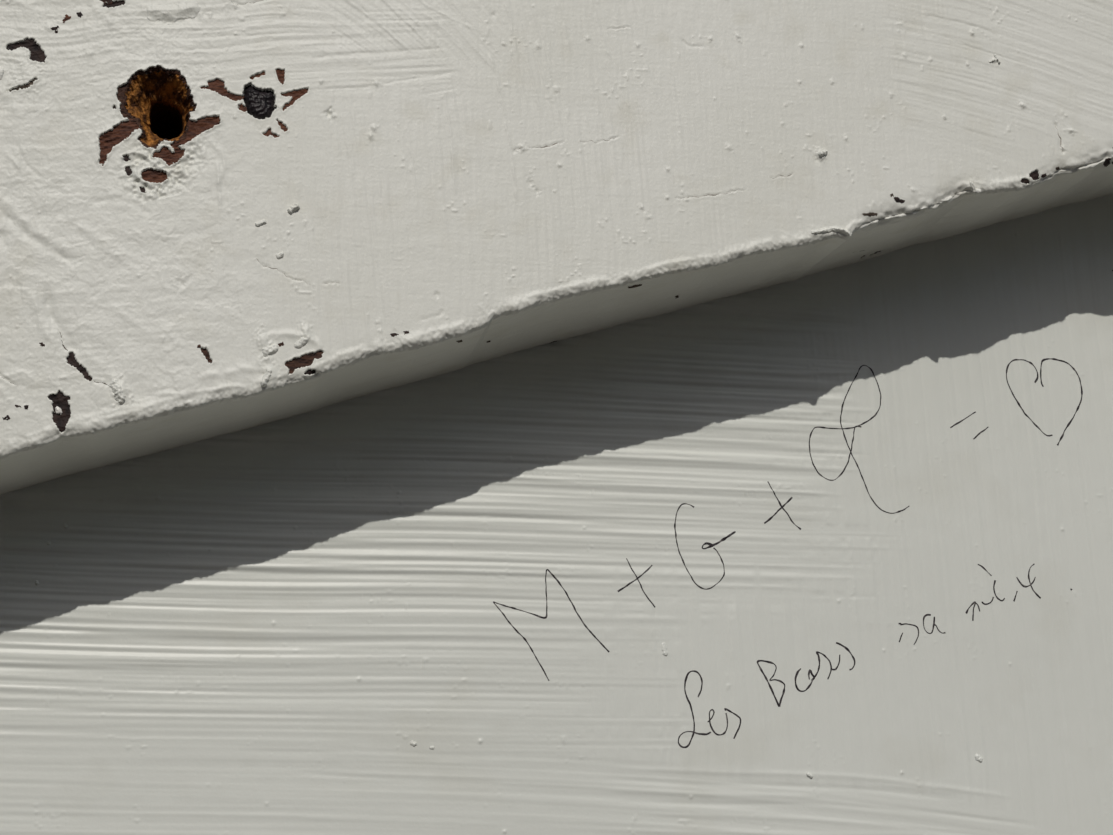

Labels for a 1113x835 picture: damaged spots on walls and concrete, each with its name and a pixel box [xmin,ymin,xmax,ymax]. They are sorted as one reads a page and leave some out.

peeling [100,0,125,8]
peeling [6,38,46,63]
peeling [201,79,247,112]
peeling [250,69,308,138]
peeling [123,145,185,193]
peeling [285,351,324,375]
peeling [48,391,71,432]